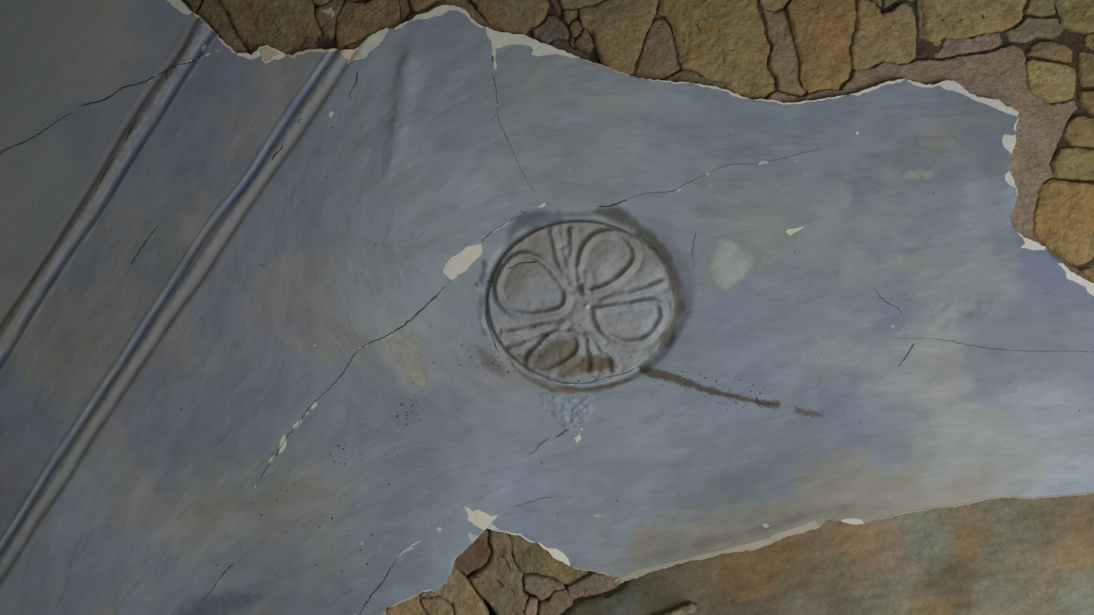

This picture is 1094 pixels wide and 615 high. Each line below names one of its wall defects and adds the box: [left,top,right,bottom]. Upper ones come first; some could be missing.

crack [0,24,219,154]
crack [490,48,498,70]
spalling [167,0,1094,296]
crack [254,282,450,489]
crack [360,520,436,614]
spalling [382,507,819,615]
spalling [841,498,998,525]